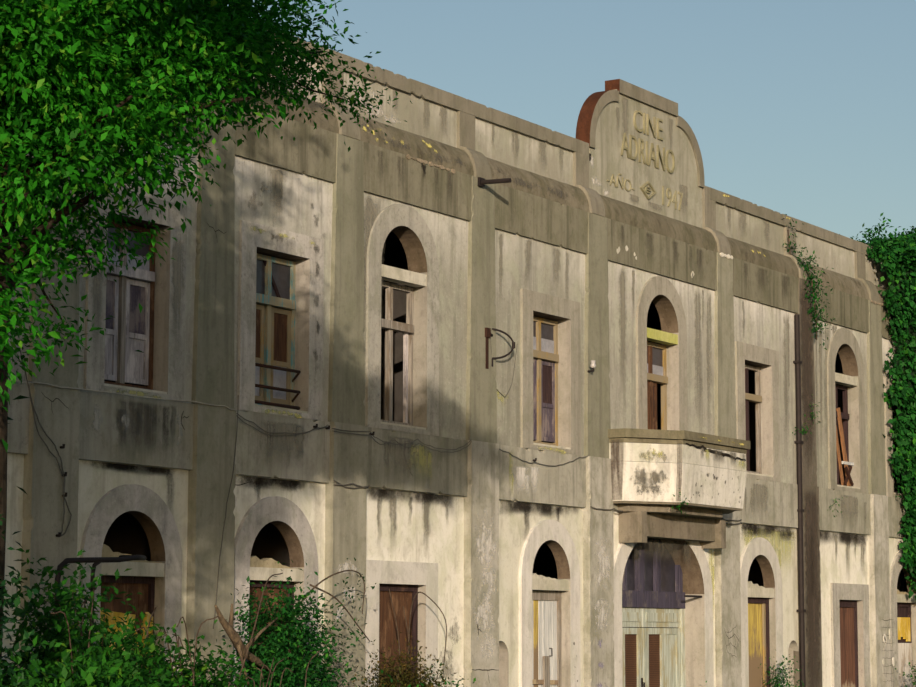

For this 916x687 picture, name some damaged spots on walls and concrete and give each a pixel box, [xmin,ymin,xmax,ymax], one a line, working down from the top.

water stain [636,451,666,492]
water stain [371,489,449,534]
water stain [743,524,792,565]